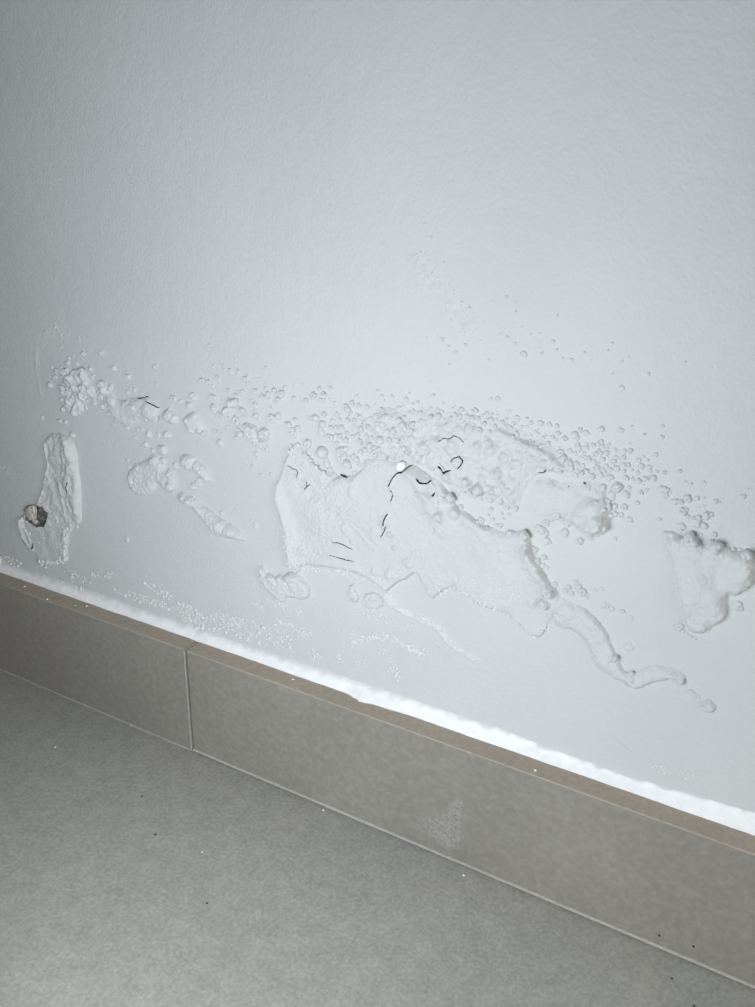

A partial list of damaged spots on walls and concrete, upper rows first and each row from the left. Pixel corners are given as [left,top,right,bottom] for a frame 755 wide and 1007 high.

spalling [23,505,48,527]